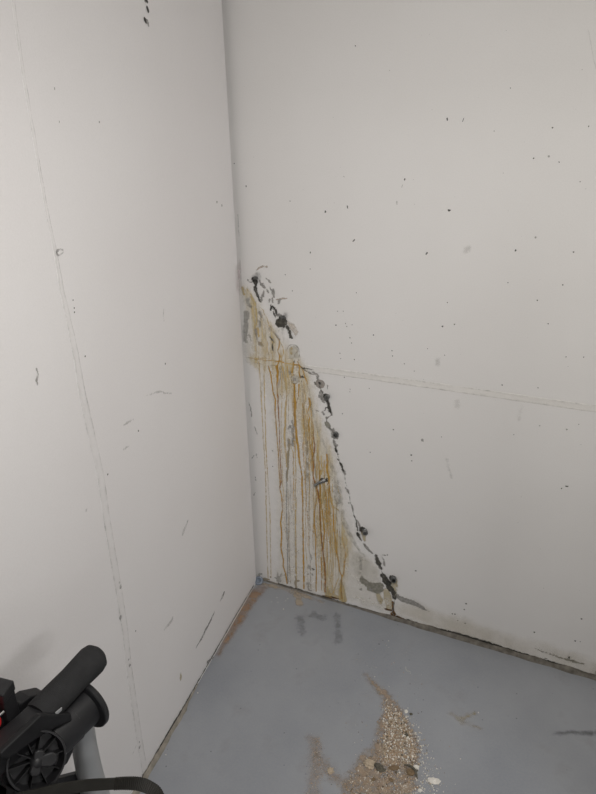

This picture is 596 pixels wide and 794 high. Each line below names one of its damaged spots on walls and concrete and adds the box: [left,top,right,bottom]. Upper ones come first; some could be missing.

rust [254,338,348,605]
crack [251,277,587,673]